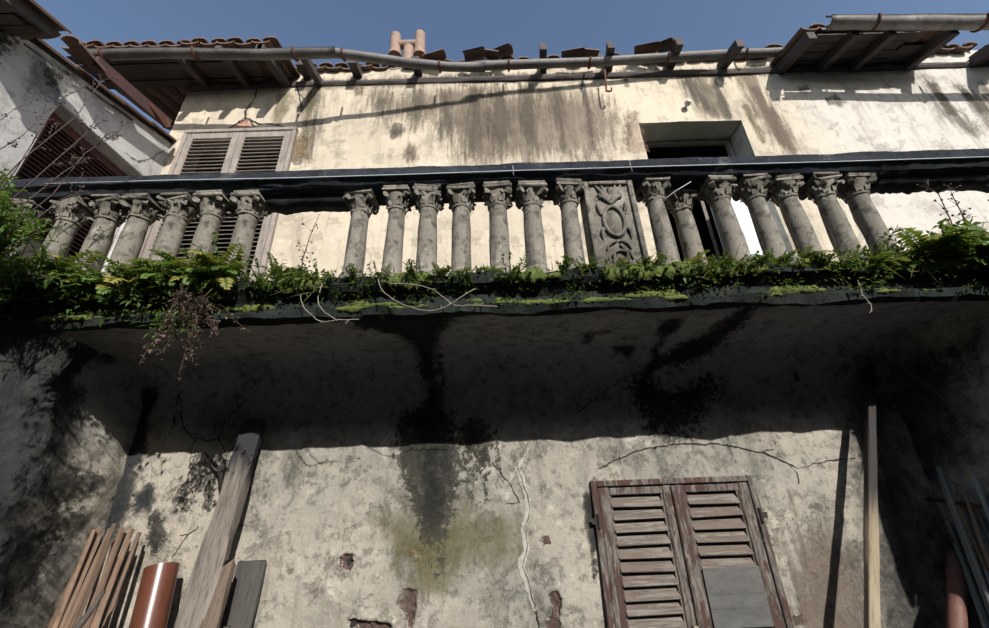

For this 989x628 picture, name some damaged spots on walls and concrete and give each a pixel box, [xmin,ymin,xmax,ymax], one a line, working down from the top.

crack [226,87,305,129]
water stain [298,71,630,163]
water stain [659,66,796,155]
water stain [0,330,218,613]
crack [179,391,247,469]
water stain [353,317,505,592]
crack [599,442,852,484]
spalling [338,551,355,571]
crack [492,446,540,628]
spalling [347,614,391,628]
spalling [396,586,417,628]
peeling [546,591,564,628]